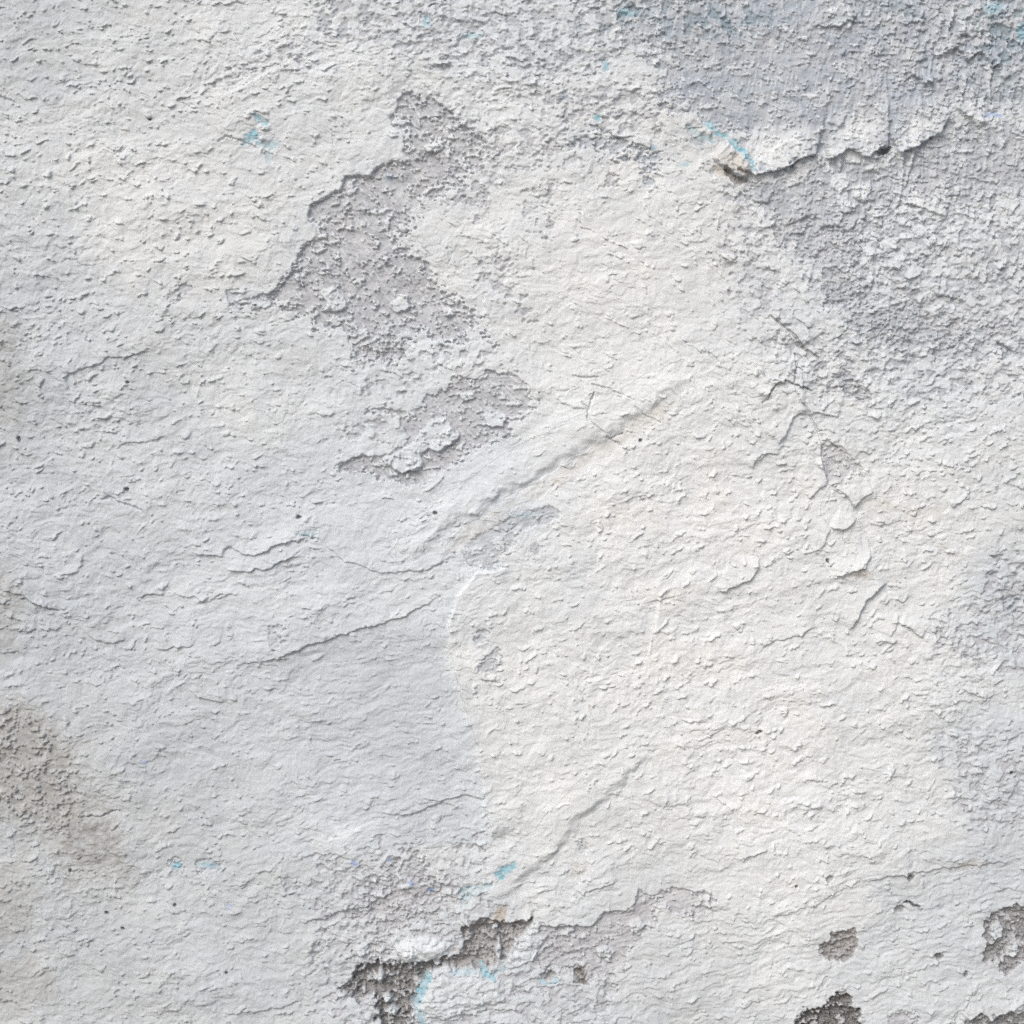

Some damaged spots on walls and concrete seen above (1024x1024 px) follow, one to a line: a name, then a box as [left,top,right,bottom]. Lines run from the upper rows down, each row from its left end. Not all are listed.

peeling [225,88,496,368]
peeling [610,0,1024,352]
peeling [335,370,537,489]
crack [762,316,872,578]
peeling [310,843,715,1024]
flaking render [795,990,862,1024]
flaking render [819,927,858,962]
flaking render [982,903,1024,976]